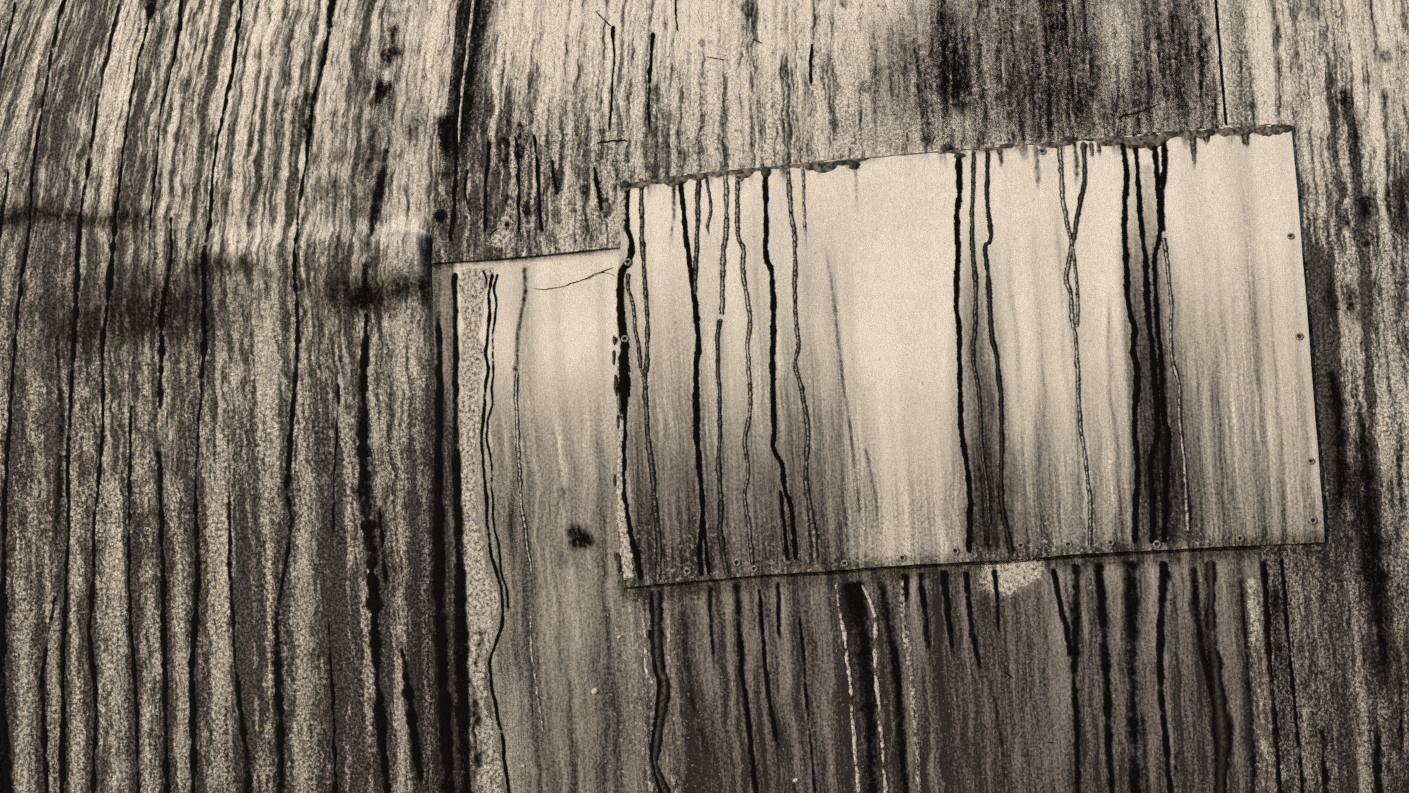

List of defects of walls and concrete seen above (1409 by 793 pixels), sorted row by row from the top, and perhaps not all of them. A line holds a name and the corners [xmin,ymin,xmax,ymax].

water stain [873,0,1227,142]
rust [1189,135,1210,166]
rust [953,149,1015,553]
rust [1120,132,1190,543]
rust [1051,141,1177,793]
rust [835,569,981,793]
rust [991,569,999,631]
rust [1190,560,1233,793]
rust [1239,578,1255,793]